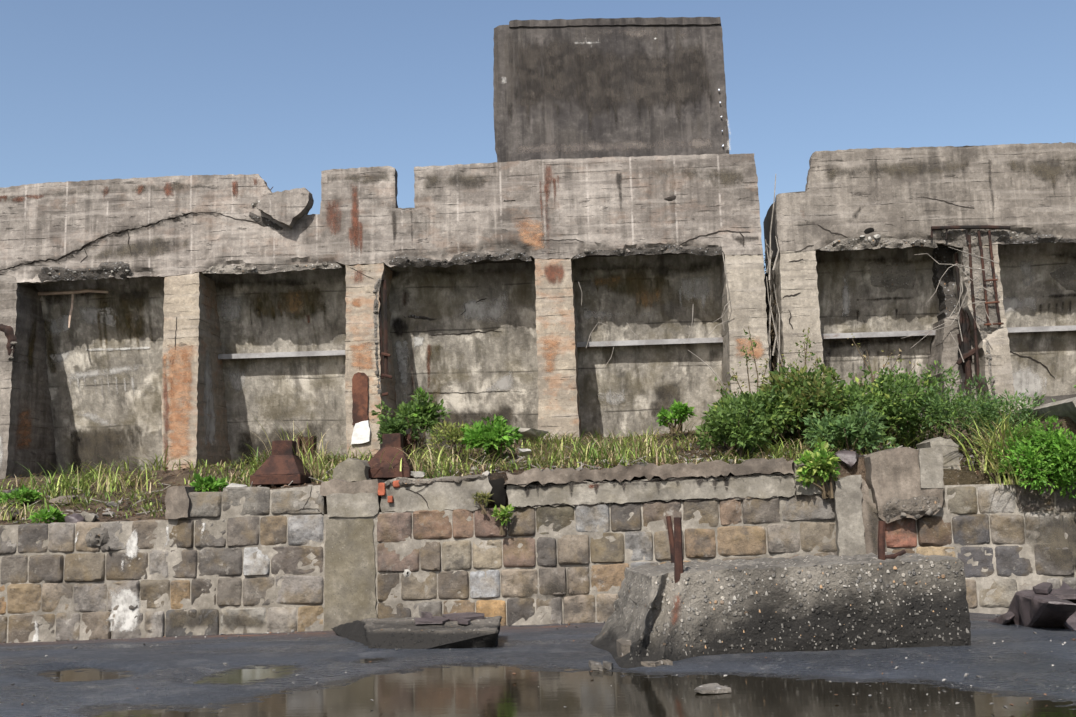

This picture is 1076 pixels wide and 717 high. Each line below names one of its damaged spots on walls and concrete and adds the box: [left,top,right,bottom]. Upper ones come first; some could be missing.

corrosion [349,189,362,247]
crack [0,212,265,271]
spalling [573,244,724,259]
crack [679,230,750,246]
spalling [38,261,133,283]
spalling [818,225,1076,399]
crack [1010,351,1055,378]